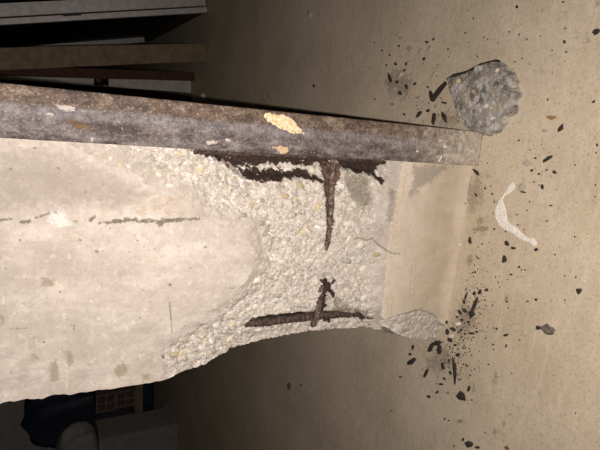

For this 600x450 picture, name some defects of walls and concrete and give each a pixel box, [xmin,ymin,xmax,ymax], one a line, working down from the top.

crack [0,211,56,224]
crack [89,217,197,226]
corrosion [205,155,386,240]
spalling [68,142,446,381]
corrosion [245,278,336,328]